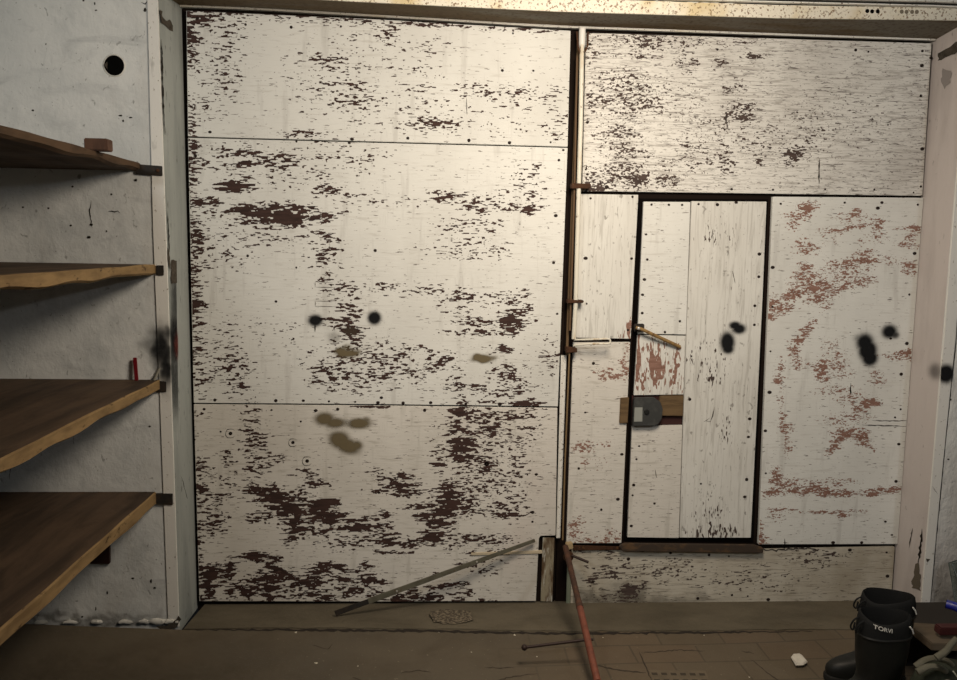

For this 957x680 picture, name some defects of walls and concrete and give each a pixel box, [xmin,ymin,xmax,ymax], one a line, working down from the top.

peeling [583,33,889,192]
peeling [187,11,569,602]
peeling [768,200,921,456]
peeling [567,515,853,603]
peeling [759,467,902,544]